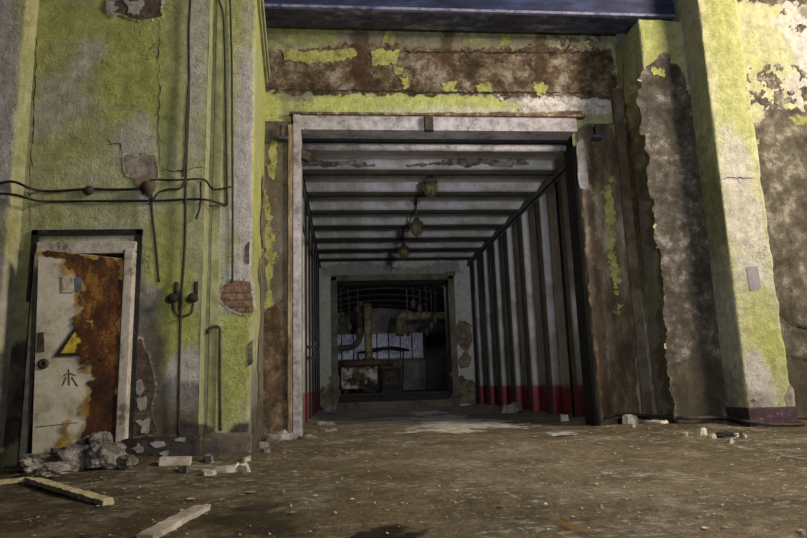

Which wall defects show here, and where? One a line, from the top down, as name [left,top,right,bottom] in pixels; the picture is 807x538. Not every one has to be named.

spalling [103,0,165,24]
spalling [737,0,807,32]
rust [265,42,618,100]
peeling [746,63,807,362]
spalling [218,140,278,447]
rust [578,123,639,425]
rust [39,250,124,453]
spalling [133,335,160,438]
rust [263,300,288,433]
spalling [785,385,795,406]
leakage [786,357,807,420]